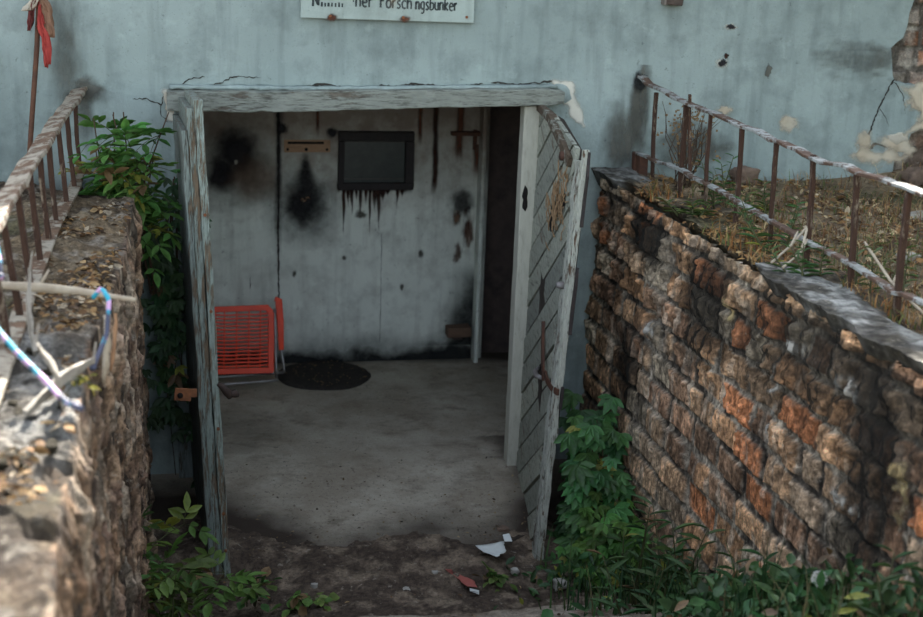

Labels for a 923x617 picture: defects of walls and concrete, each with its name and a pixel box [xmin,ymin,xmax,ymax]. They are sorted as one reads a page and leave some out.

corrosion [456,108,464,155]
flaking render [553,80,585,127]
crack [868,79,906,150]
flaking render [852,0,923,170]